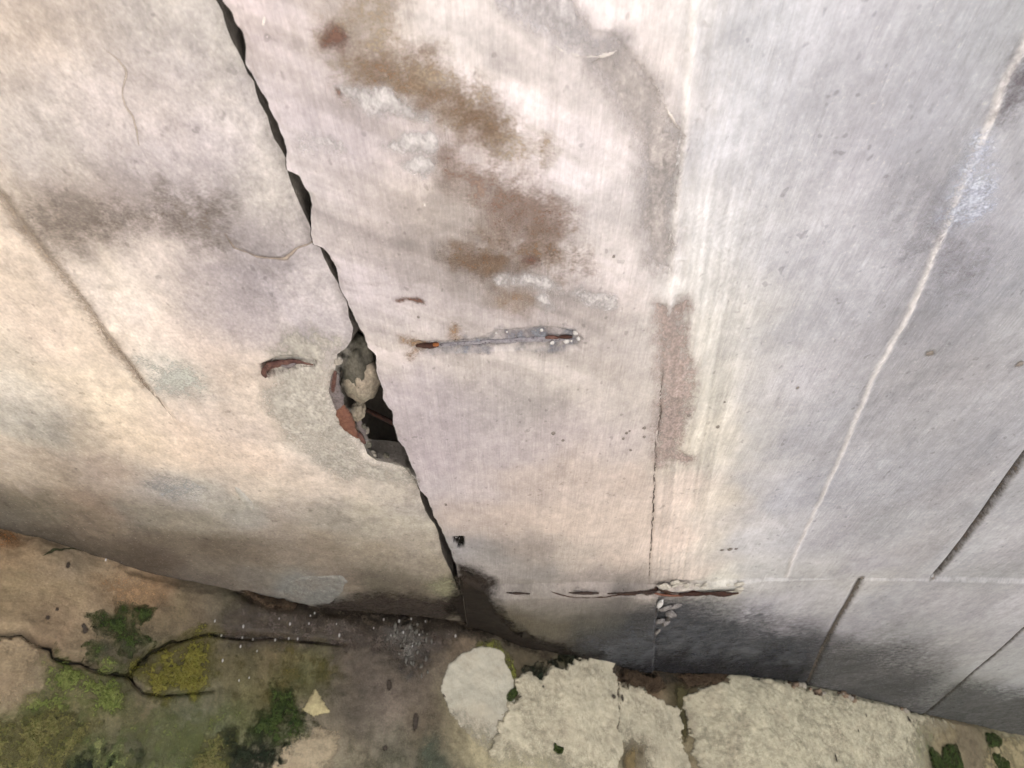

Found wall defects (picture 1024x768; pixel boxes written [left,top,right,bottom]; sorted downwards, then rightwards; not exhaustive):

crack [217,0,460,583]
spalling [261,331,415,483]
crack [932,450,1024,580]
crack [0,634,223,697]
corrosion [552,586,739,598]
spalling [655,579,708,636]
crack [806,576,864,682]